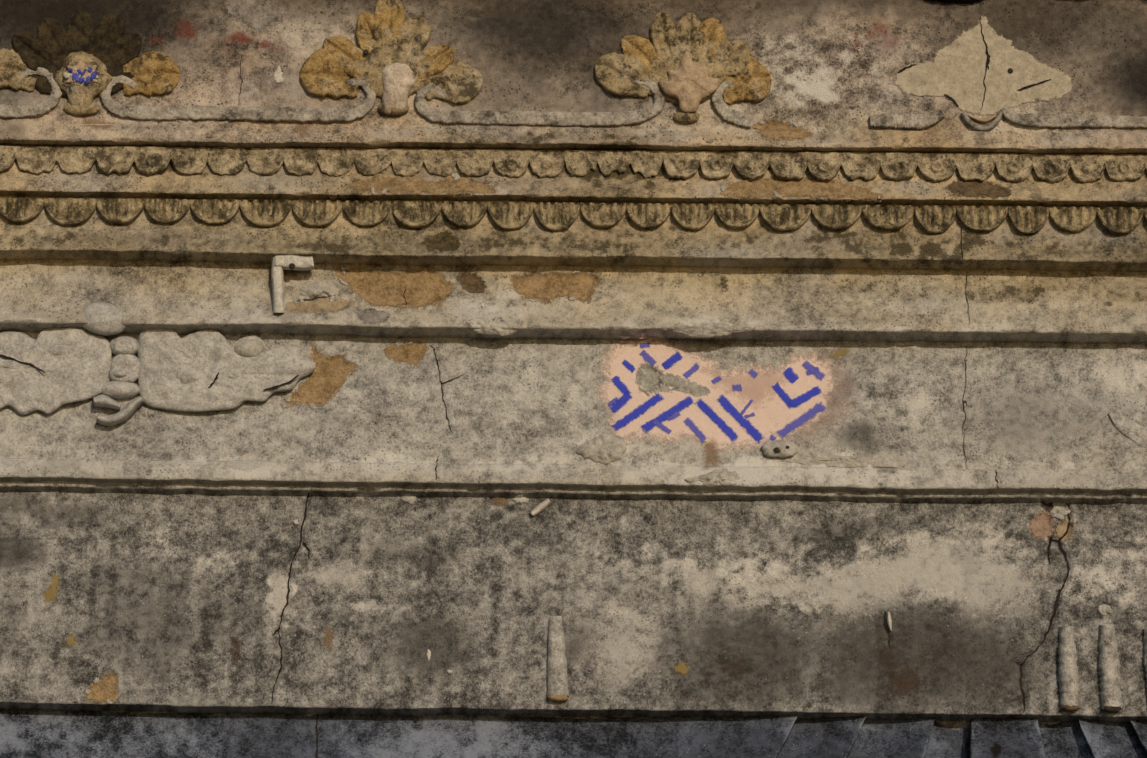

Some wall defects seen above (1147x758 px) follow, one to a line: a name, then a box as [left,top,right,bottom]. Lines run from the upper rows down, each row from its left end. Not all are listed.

flaking render [425,230,460,251]
flaking render [285,264,487,324]
flaking render [510,268,600,305]
flaking render [280,343,358,409]
flaking render [384,339,429,367]
crack [430,345,464,432]
crack [272,492,310,702]
crack [1016,509,1071,713]
flaking render [83,672,119,707]
crack [313,714,321,758]